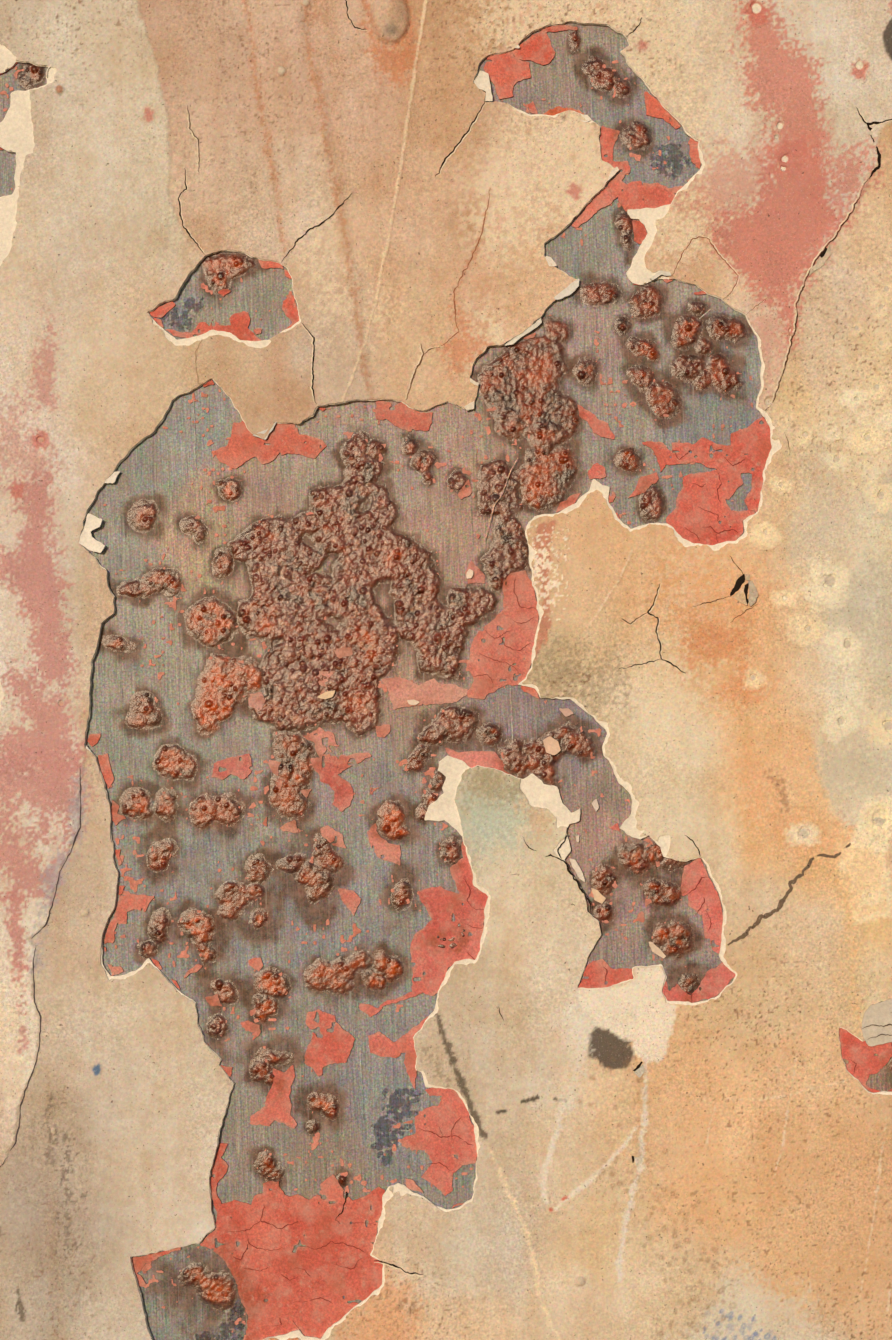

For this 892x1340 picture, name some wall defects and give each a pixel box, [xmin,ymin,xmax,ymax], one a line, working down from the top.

peeling [846,55,872,84]
peeling [0,44,57,266]
crack [178,105,206,255]
crack [281,193,352,263]
crack [675,450,754,623]
rust [96,201,761,1143]
peeling [79,22,798,1340]
crack [619,584,687,674]
peeling [730,550,870,672]
crack [685,835,851,946]
peeling [781,816,827,853]
peeling [839,999,892,1095]